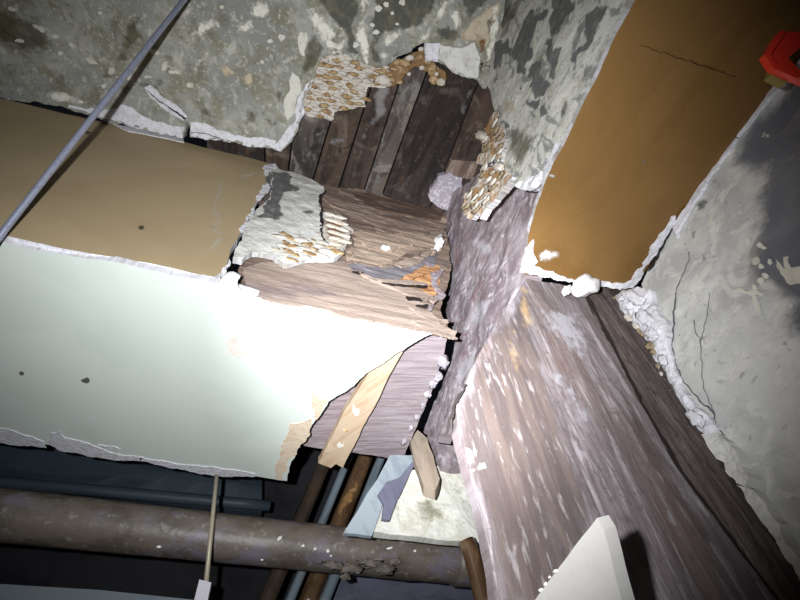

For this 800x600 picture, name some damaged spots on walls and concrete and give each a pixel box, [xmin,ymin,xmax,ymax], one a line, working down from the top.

peeling [190,19,220,36]
peeling [239,2,269,31]
peeling [298,0,575,117]
peeling [571,6,607,70]
crack [640,44,736,77]
flaking render [462,112,561,221]
flaking render [233,168,354,269]
crack [671,252,724,435]
flaking render [613,287,800,580]